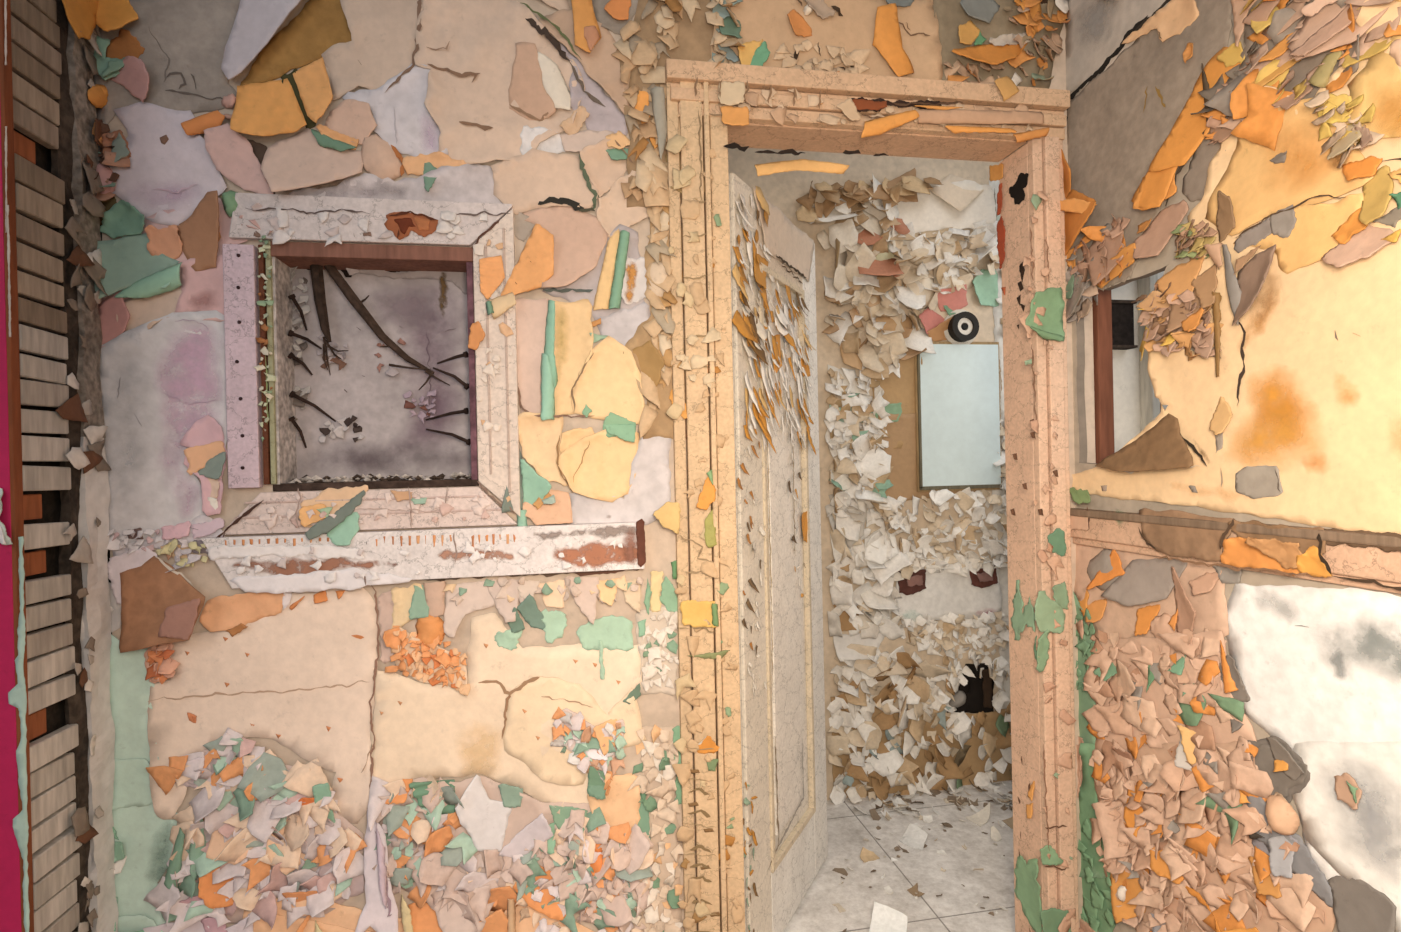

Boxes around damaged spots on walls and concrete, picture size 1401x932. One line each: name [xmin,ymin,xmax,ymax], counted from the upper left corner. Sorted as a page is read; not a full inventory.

crack [1067,0,1171,119]
peeling [62,0,466,442]
crack [1236,195,1345,238]
peeling [468,321,485,350]
crack [1237,322,1246,405]
flaking render [55,373,111,474]
peeling [473,0,1401,932]
flaking render [63,523,94,564]
corrosion [625,519,646,567]
flaking render [74,636,95,692]
peeling [106,415,738,932]
flaking render [78,877,100,932]